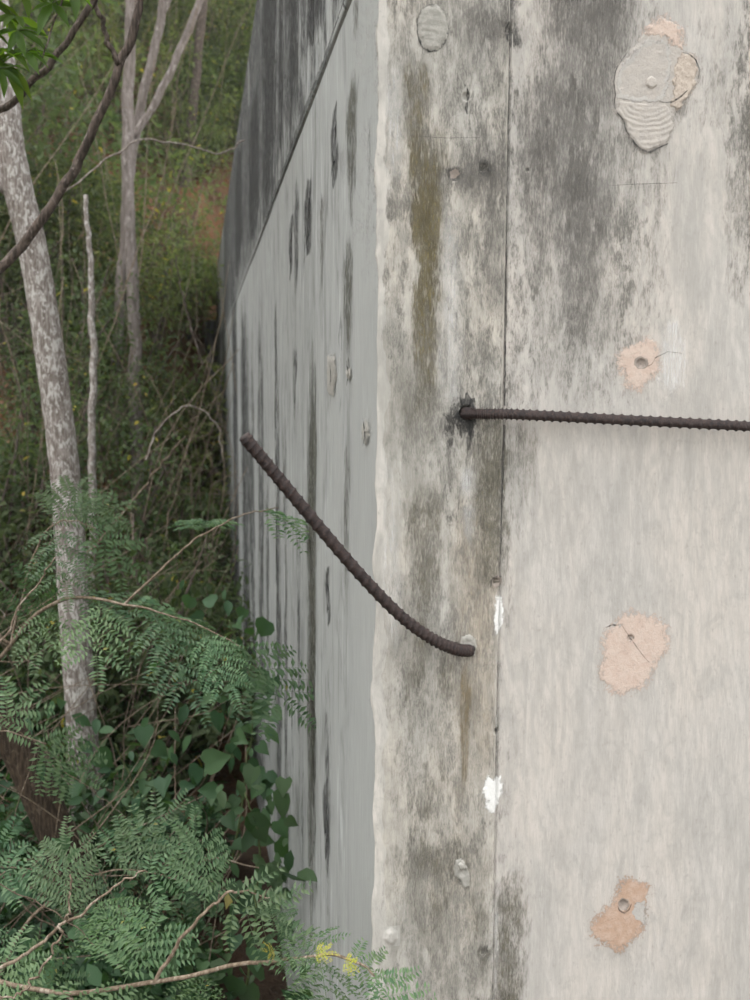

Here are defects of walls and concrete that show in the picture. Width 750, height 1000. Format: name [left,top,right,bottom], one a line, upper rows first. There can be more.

damp [347,83,356,195]
damp [508,0,649,367]
spalling [611,12,701,154]
damp [729,101,750,249]
damp [344,248,352,345]
damp [387,0,522,643]
spalling [612,335,677,393]
damp [217,0,336,900]
damp [399,629,465,781]
spalling [597,607,671,697]
damp [406,838,524,1000]
spalling [587,875,655,954]